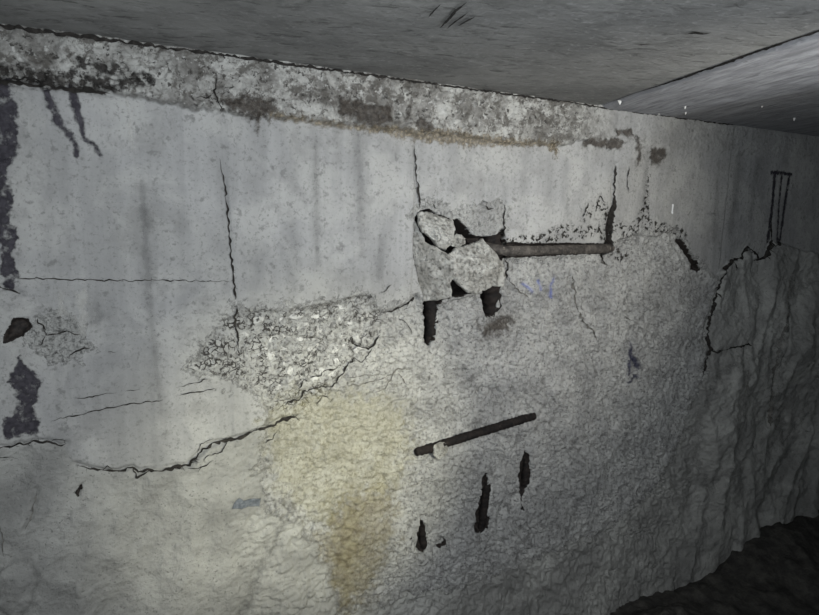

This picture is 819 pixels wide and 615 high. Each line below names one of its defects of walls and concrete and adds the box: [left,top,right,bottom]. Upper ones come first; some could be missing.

leakage [0,56,154,290]
crack [0,161,415,479]
spalling [181,174,719,615]
corrosion [414,413,537,456]
crack [571,276,598,342]
crack [583,167,630,266]
crack [702,215,781,374]